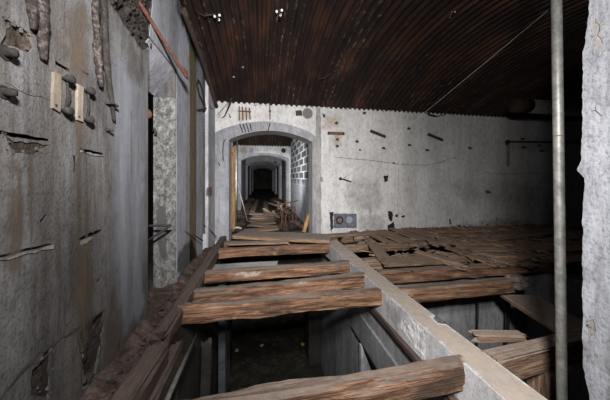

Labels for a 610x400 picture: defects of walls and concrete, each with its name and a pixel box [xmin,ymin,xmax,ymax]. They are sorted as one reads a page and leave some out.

spalling [1,15,33,52]
spalling [109,0,152,50]
spalling [0,131,52,155]
spalling [31,348,55,400]
spalling [80,312,106,390]